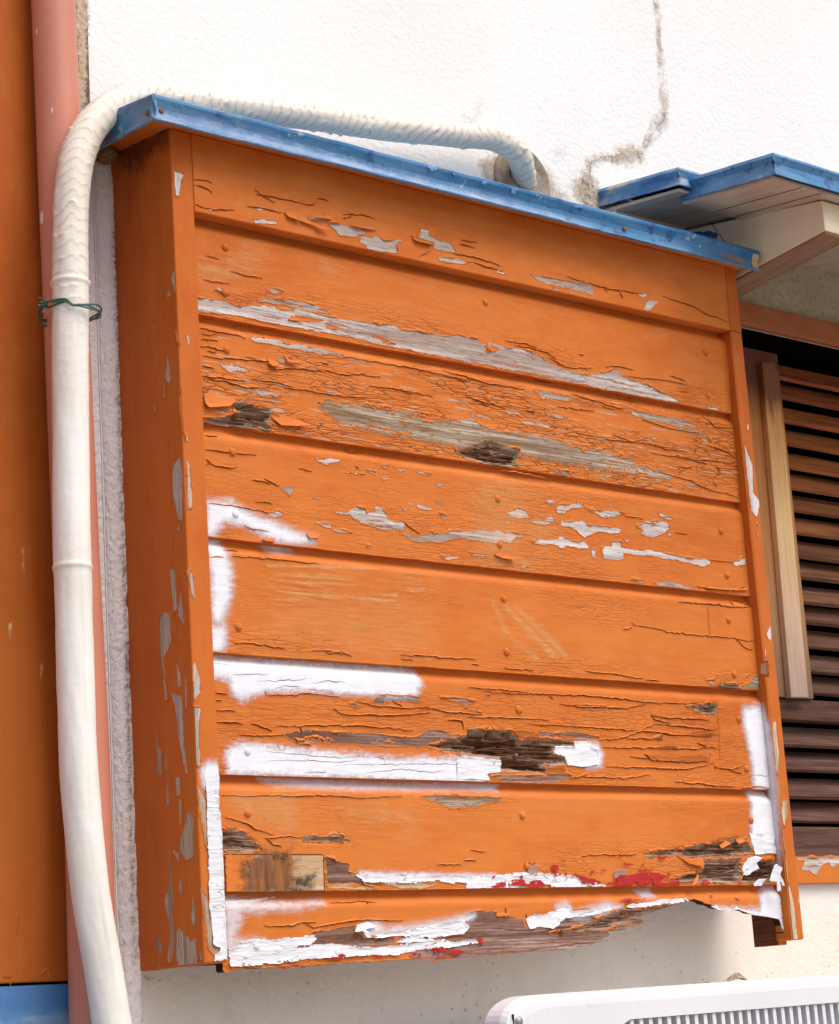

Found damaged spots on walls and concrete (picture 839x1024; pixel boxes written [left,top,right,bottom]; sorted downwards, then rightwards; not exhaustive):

crack [581,0,669,208]